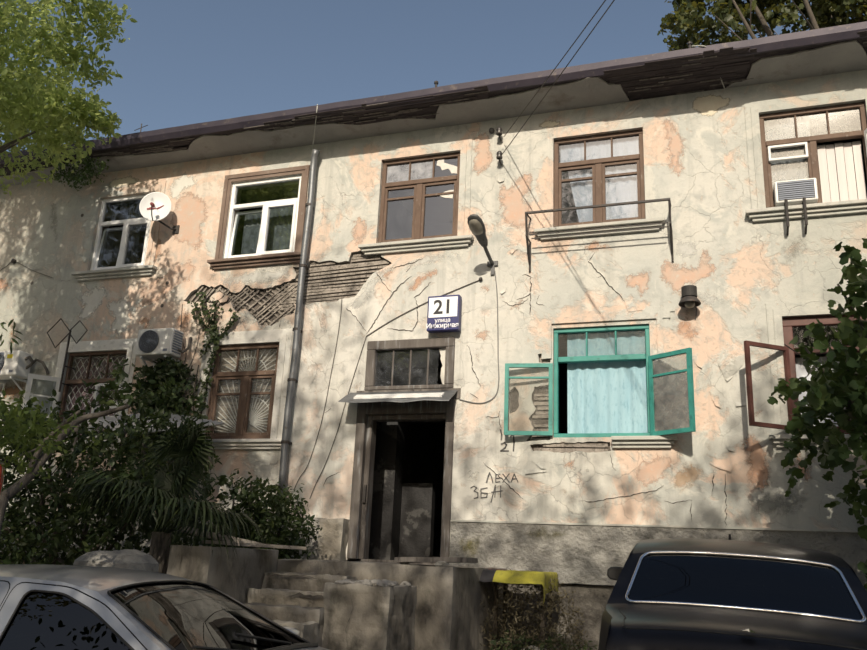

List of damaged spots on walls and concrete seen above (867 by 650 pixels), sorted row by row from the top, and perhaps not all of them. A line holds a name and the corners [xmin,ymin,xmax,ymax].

peeling [170,174,207,247]
peeling [497,174,532,229]
peeling [79,262,196,334]
flaking render [186,217,392,326]
crack [347,259,429,333]
crack [588,252,623,299]
peeling [661,253,716,291]
crack [467,345,481,398]
crack [483,462,523,499]
crack [583,485,692,520]
crack [712,470,728,525]
peeling [709,436,768,488]